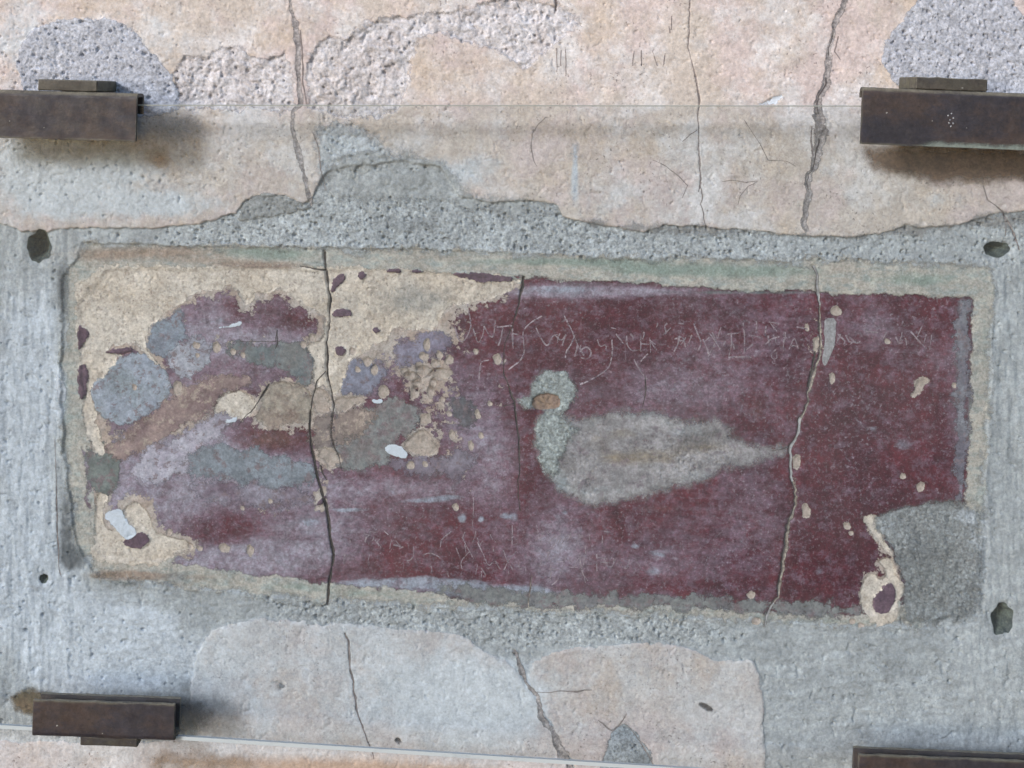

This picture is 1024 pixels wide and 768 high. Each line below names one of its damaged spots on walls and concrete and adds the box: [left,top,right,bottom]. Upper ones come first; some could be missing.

crack [289,0,326,206]
flaking render [172,0,580,184]
crack [653,0,847,232]
peeling [90,492,203,567]
peeling [74,261,522,486]
crack [300,251,342,605]
crack [764,265,822,628]
peeling [849,514,904,628]
peeling [900,473,925,492]
crack [344,633,374,758]
crack [512,650,589,768]